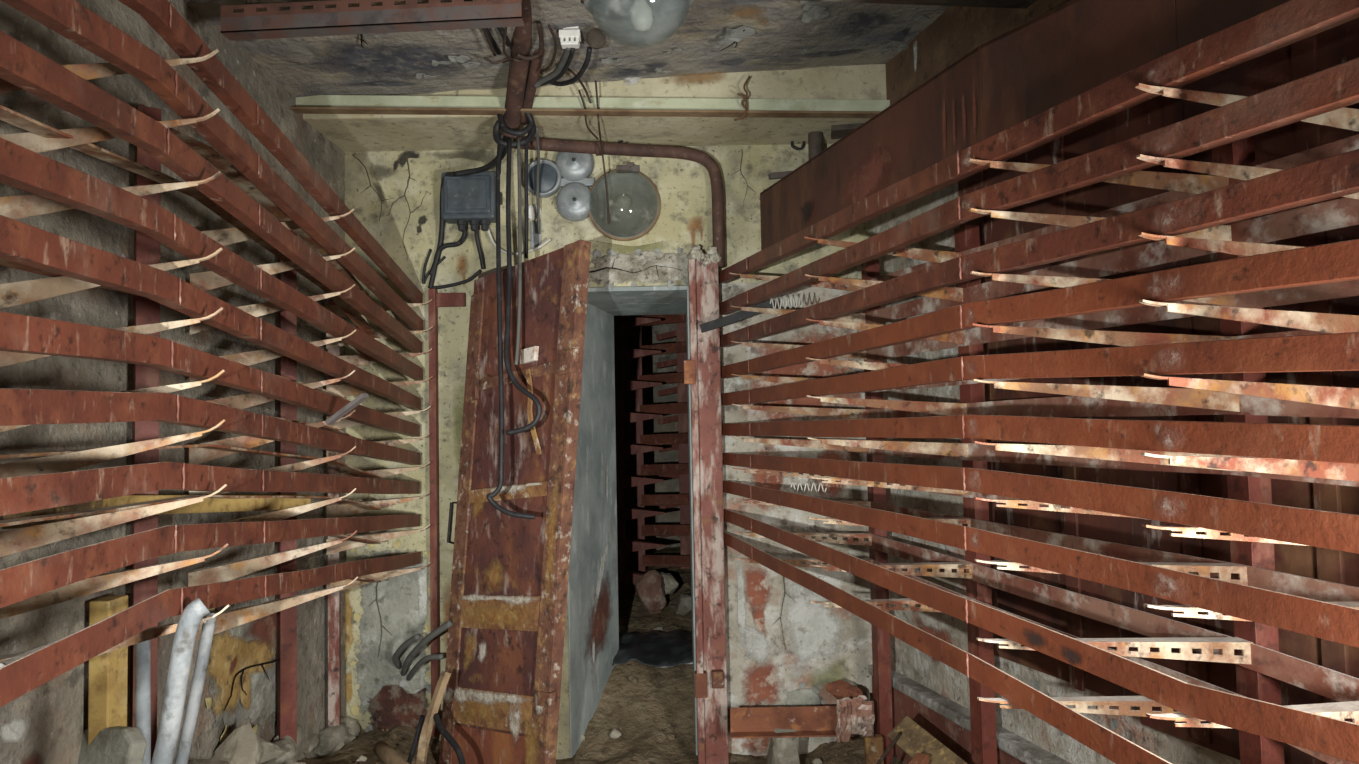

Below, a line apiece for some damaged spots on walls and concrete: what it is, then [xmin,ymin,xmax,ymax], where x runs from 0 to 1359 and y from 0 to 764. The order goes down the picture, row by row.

crack [352,154,426,260]
spalling [667,245,722,290]